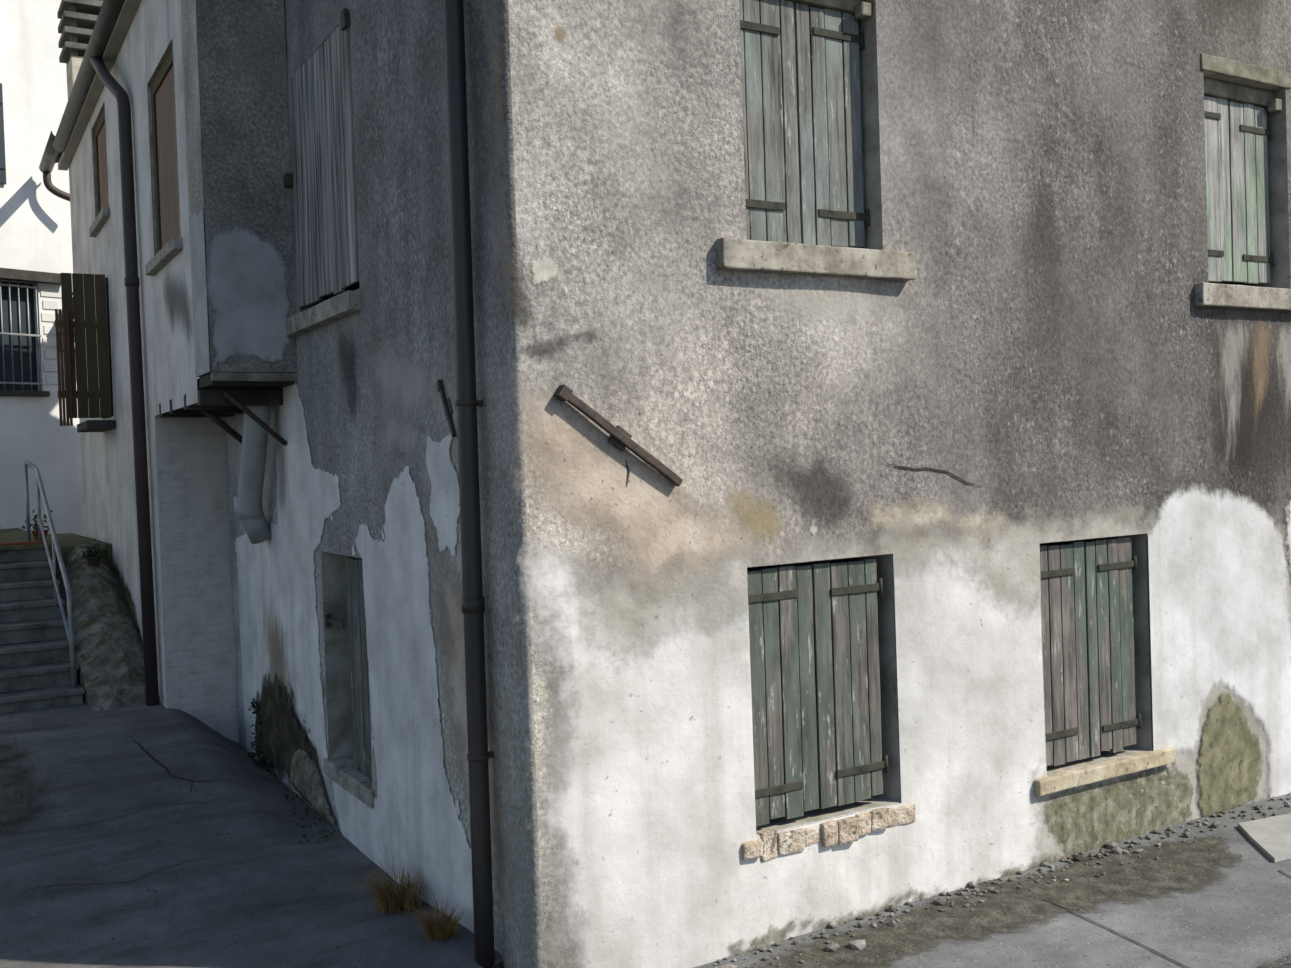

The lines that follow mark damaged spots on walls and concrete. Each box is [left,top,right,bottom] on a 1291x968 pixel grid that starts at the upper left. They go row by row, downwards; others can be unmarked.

leakage [1254,328,1268,399]
flaking render [531,398,765,655]
flaking render [788,502,1160,751]
flaking render [1273,517,1291,624]
mould [255,673,326,805]
flaking render [290,749,340,826]
flaking render [544,623,573,792]
leakage [1003,762,1193,877]
flaking render [1032,682,1270,864]
leakage [730,890,938,957]